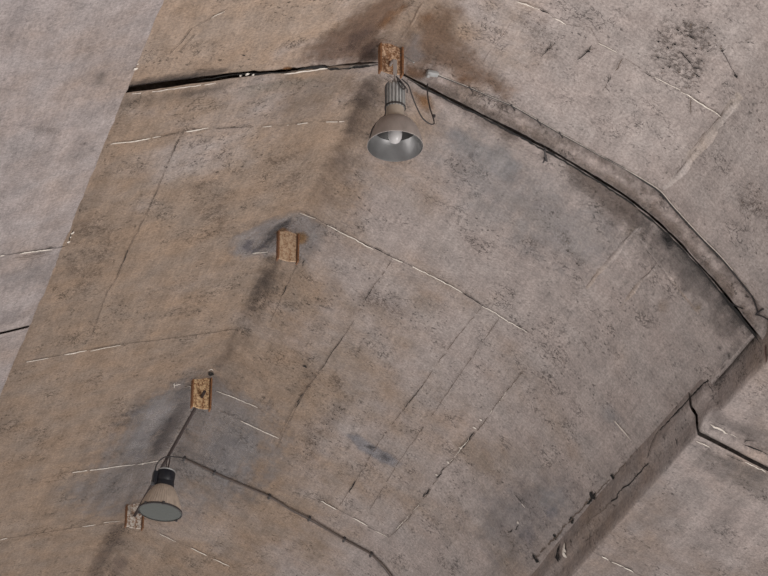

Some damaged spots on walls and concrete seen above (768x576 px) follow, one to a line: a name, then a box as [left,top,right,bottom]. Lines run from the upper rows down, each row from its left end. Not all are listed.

crack [163,64,378,81]
damp [235,216,318,257]
crack [217,211,528,537]
damp [77,387,256,508]
crack [532,379,765,576]